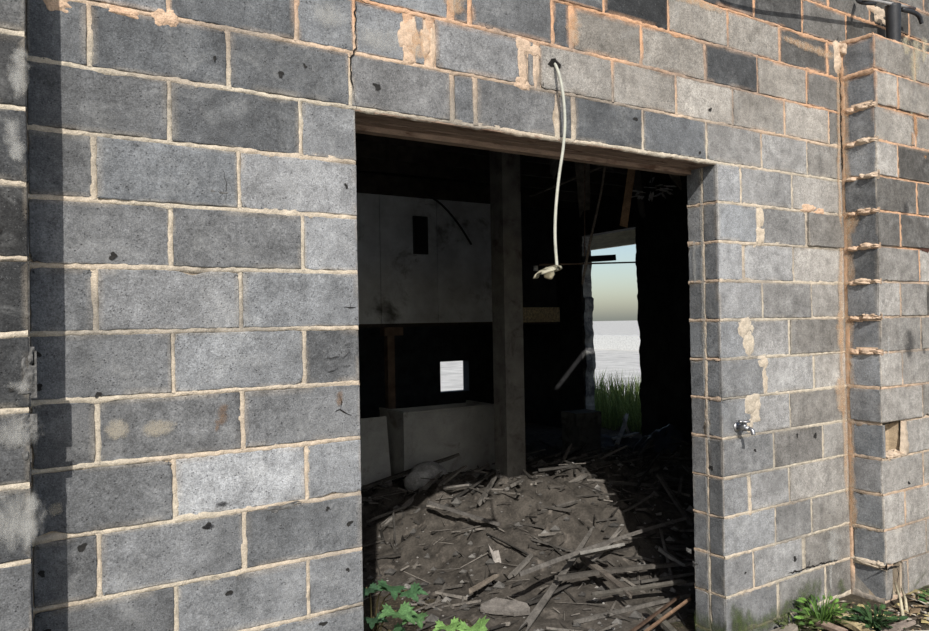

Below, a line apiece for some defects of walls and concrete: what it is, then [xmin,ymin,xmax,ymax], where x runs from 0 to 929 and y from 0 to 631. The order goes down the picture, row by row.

crack [330,0,373,107]
crack [837,67,845,169]
crack [790,559,838,574]